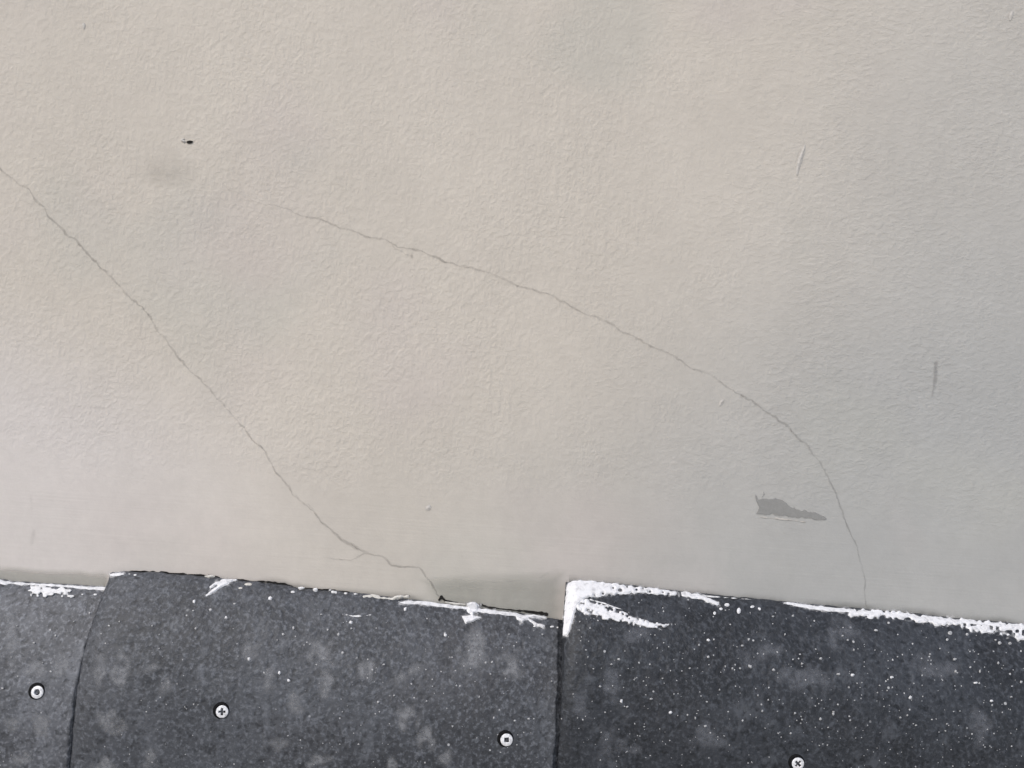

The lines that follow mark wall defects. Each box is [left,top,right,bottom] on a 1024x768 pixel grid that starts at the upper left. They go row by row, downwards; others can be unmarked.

peeling [756,496,826,522]